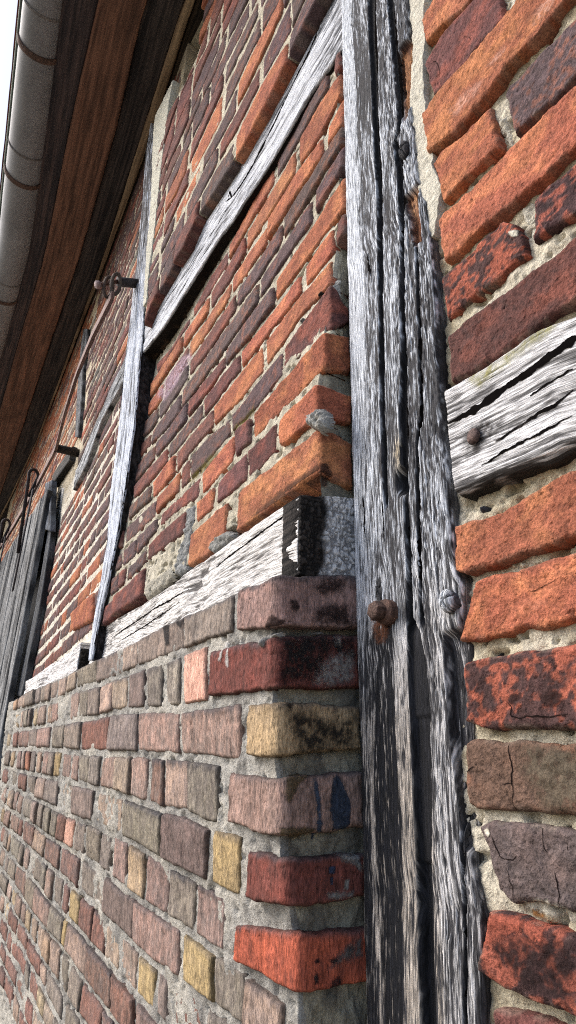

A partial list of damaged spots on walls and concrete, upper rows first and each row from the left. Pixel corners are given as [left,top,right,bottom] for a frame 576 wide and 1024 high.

crack [374,0,407,237]
crack [367,254,576,471]
crack [362,495,423,594]
crack [503,745,515,808]